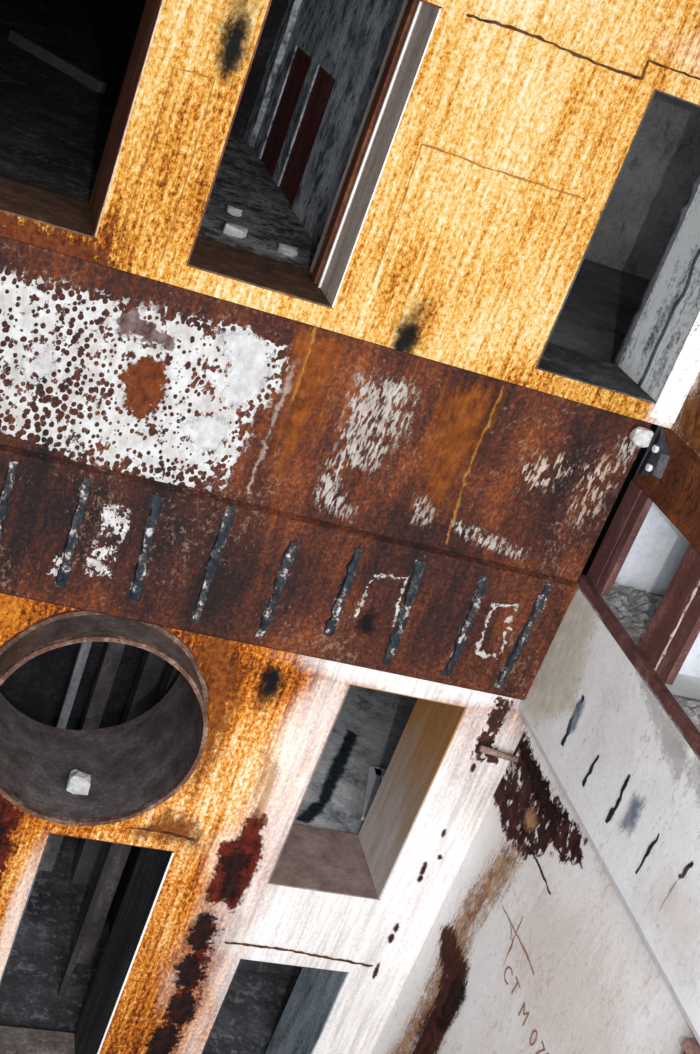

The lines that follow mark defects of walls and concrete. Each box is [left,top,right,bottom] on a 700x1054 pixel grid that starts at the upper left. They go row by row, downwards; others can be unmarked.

crack [467,14,700,80]
rust [116,307,175,420]
peeling [0,270,300,494]
peeling [315,373,416,520]
rust [418,383,503,543]
rust [673,376,700,454]
rust [0,594,40,634]
rust [196,637,239,784]
rust [0,794,24,887]
rust [136,810,201,847]
rust [146,749,278,1054]
rust [391,843,522,1054]